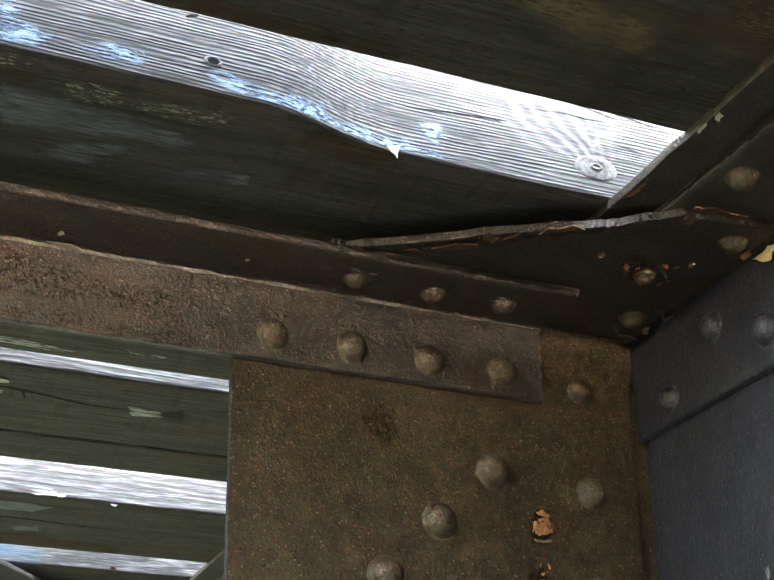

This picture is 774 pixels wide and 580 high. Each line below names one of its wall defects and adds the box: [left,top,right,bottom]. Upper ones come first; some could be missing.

rust [386,225,605,258]
crack [0,386,132,411]